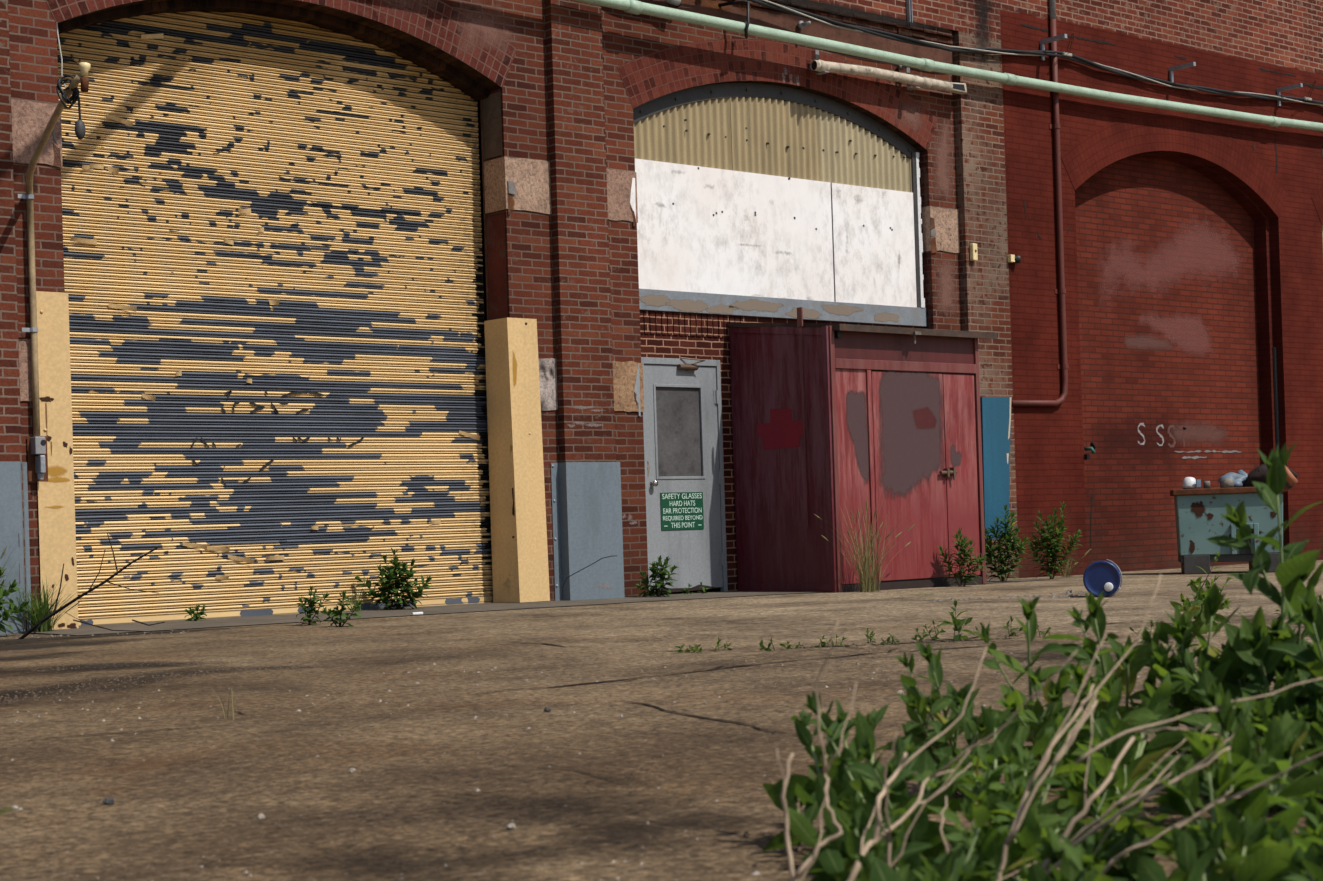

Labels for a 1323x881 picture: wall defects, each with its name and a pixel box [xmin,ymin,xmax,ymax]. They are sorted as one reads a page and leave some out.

peeling [52,21,514,617]